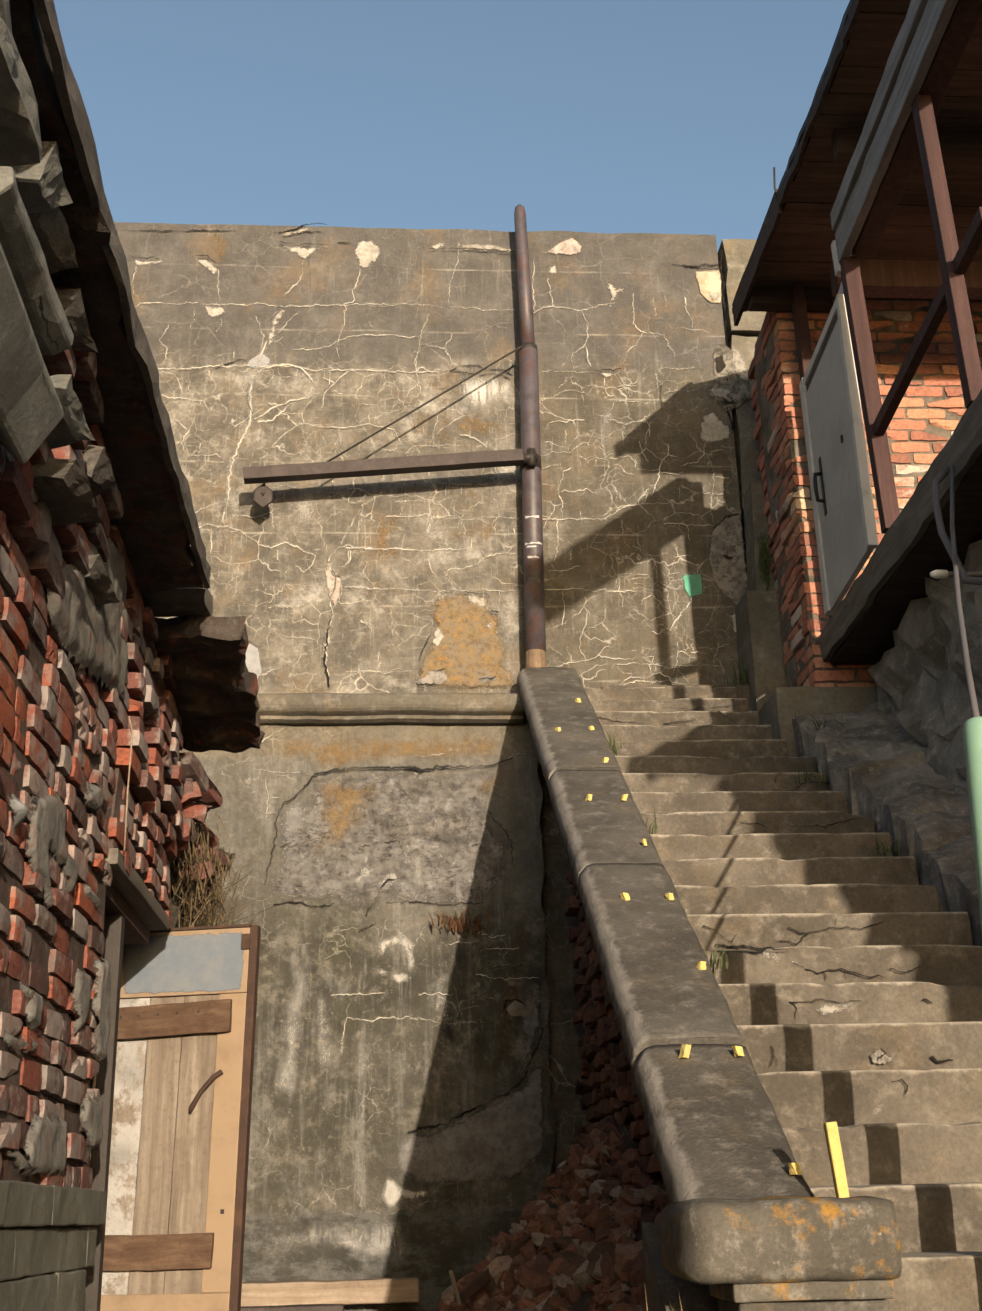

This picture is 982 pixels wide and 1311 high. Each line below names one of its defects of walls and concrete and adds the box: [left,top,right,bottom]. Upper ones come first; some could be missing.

spalling [280,228,328,259]
spalling [355,241,380,268]
spalling [695,267,722,303]
spalling [700,344,751,443]
crack [131,222,747,724]
peeling [47,537,129,695]
spalling [245,641,262,680]
spalling [416,591,514,689]
crack [258,727,298,847]
peeling [9,793,102,910]
crack [776,920,933,1019]
crack [931,1056,953,1064]